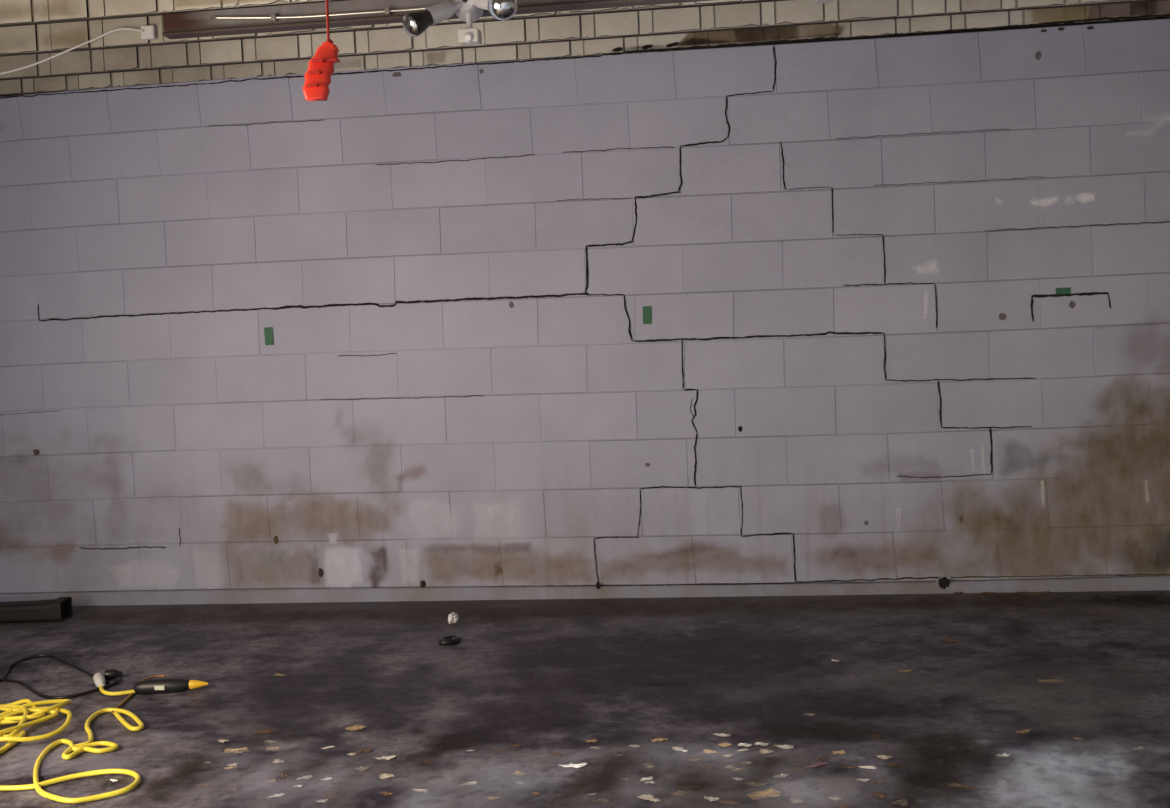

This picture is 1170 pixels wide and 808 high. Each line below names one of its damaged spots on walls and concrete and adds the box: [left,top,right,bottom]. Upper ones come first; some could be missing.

crack [38,46,1170,587]
leakage [976,404,1170,578]